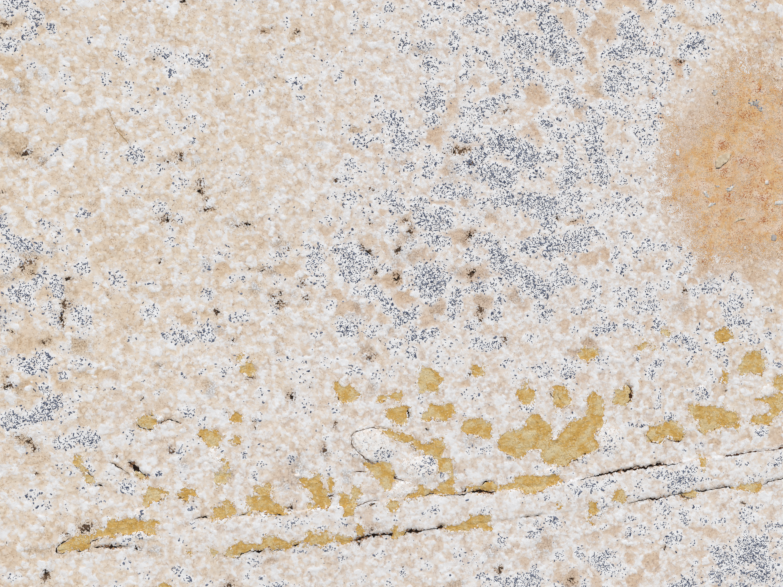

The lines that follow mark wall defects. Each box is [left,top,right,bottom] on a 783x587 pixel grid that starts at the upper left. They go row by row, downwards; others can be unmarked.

corrosion [645,39,783,278]
spalling [718,348,769,384]
spalling [644,373,783,445]
spalling [363,363,634,514]
crack [110,461,148,479]
crack [569,453,680,480]
crack [425,481,495,497]
crack [635,486,731,502]
spalling [54,516,161,558]
spalling [186,471,367,558]
crack [354,524,445,547]
spalling [443,513,493,536]